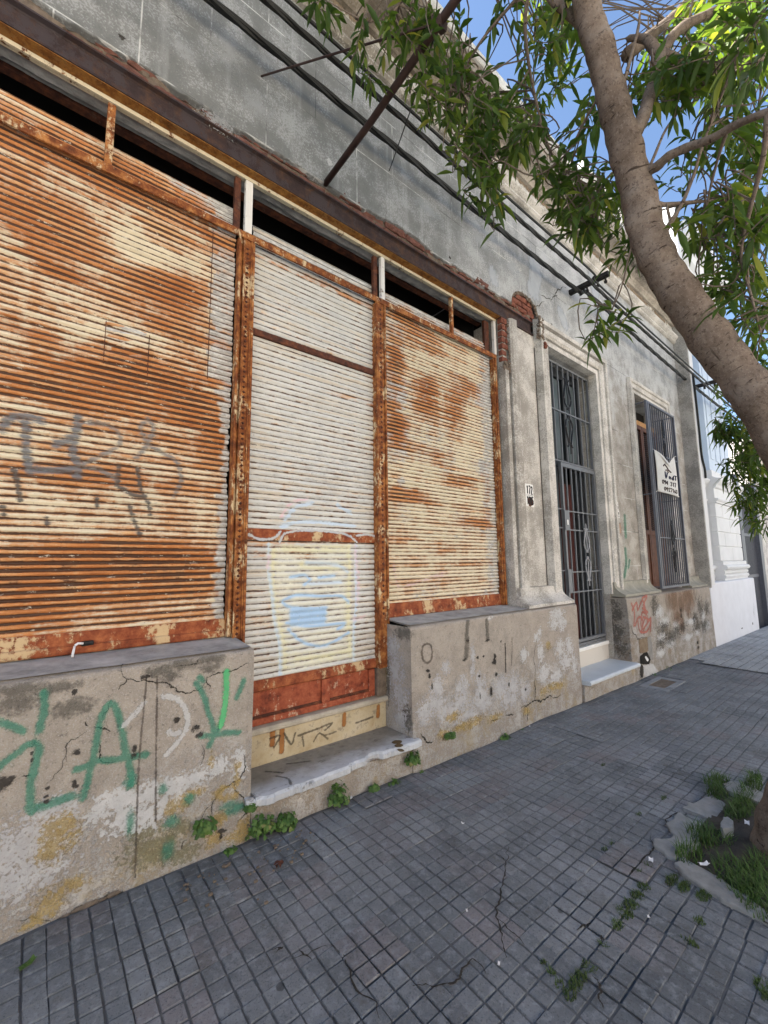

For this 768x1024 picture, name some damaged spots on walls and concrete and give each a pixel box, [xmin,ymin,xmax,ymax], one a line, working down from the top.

crack [22,658,248,782]
corrosion [269,728,285,754]
crack [491,646,561,721]